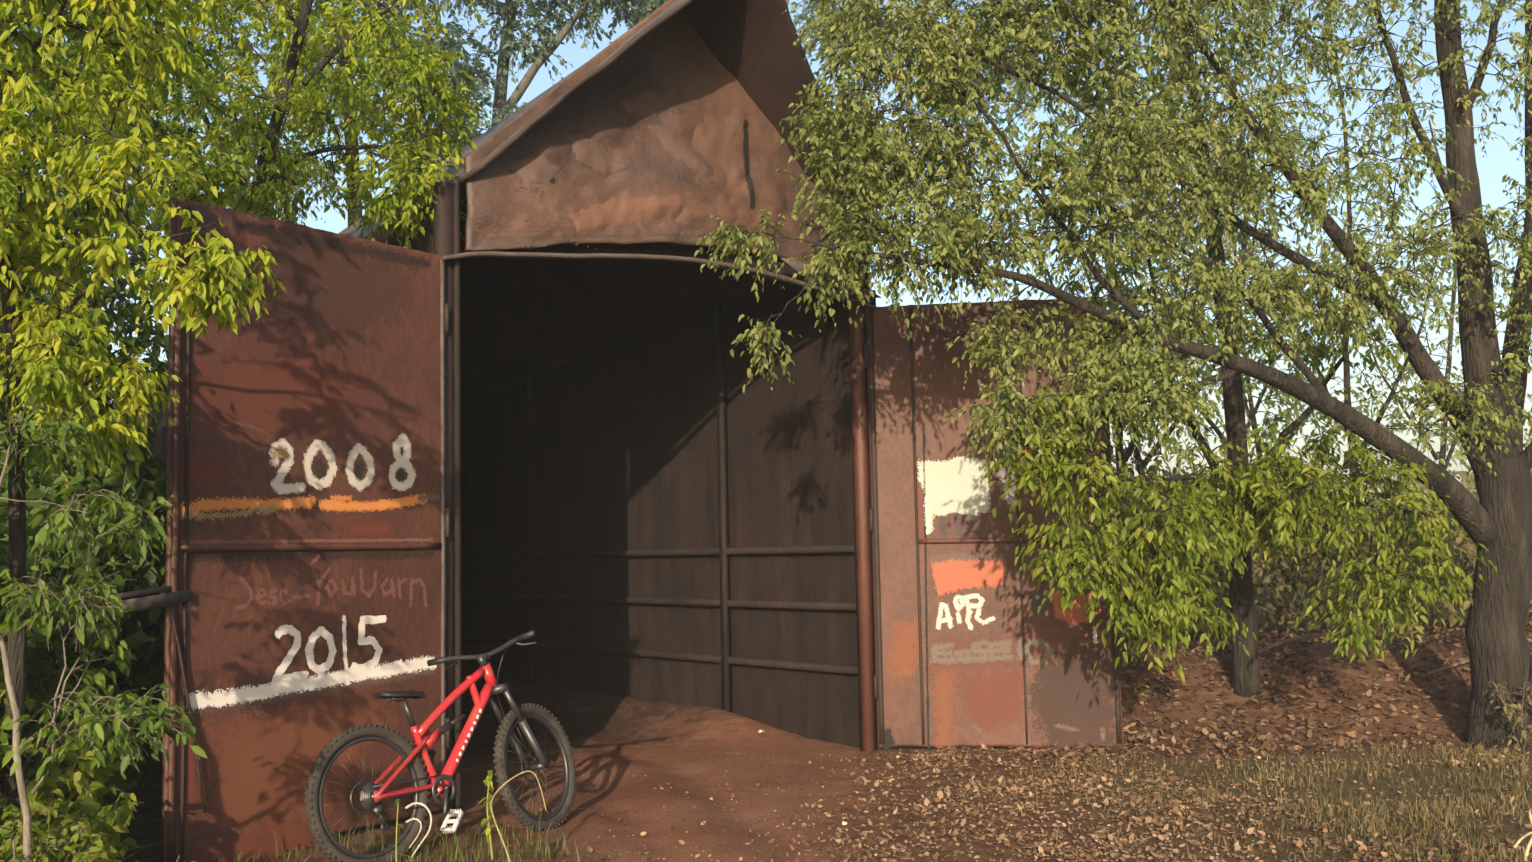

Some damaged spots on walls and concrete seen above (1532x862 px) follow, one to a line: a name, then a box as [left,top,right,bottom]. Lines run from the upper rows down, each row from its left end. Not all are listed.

rust [883,607,962,752]